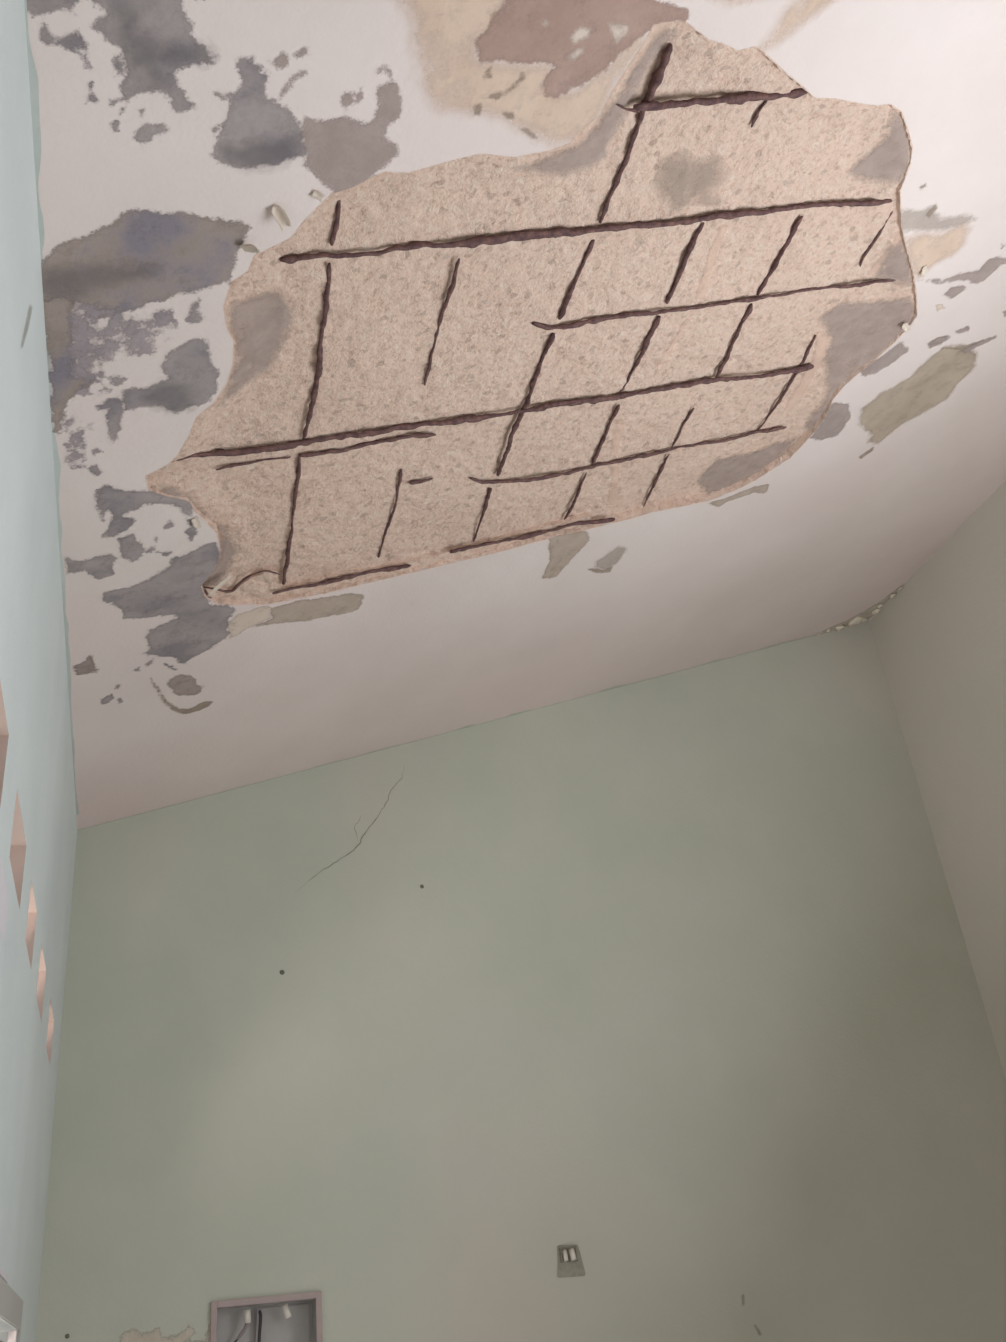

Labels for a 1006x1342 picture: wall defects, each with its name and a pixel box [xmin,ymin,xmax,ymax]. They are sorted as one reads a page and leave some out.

peeling [932,246,1006,311]
spalling [27,0,918,671]
peeling [928,327,996,352]
peeling [73,655,98,675]
damp [154,674,212,714]